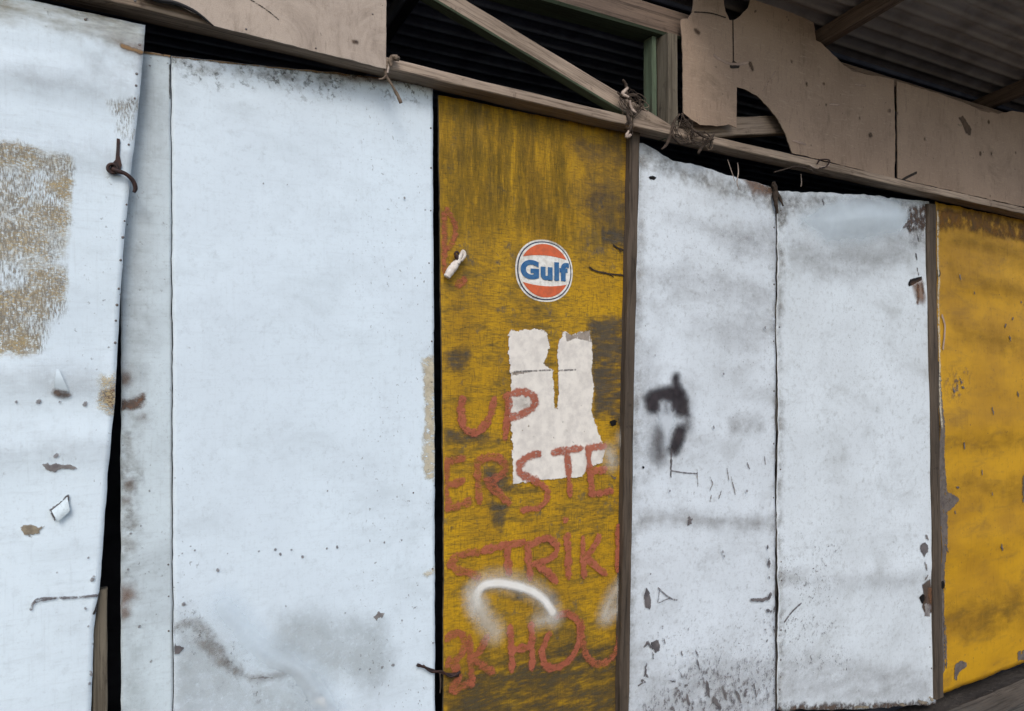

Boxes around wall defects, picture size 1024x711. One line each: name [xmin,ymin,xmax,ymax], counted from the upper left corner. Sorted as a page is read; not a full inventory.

peeling [0,142,74,354]
corrosion [97,376,145,414]